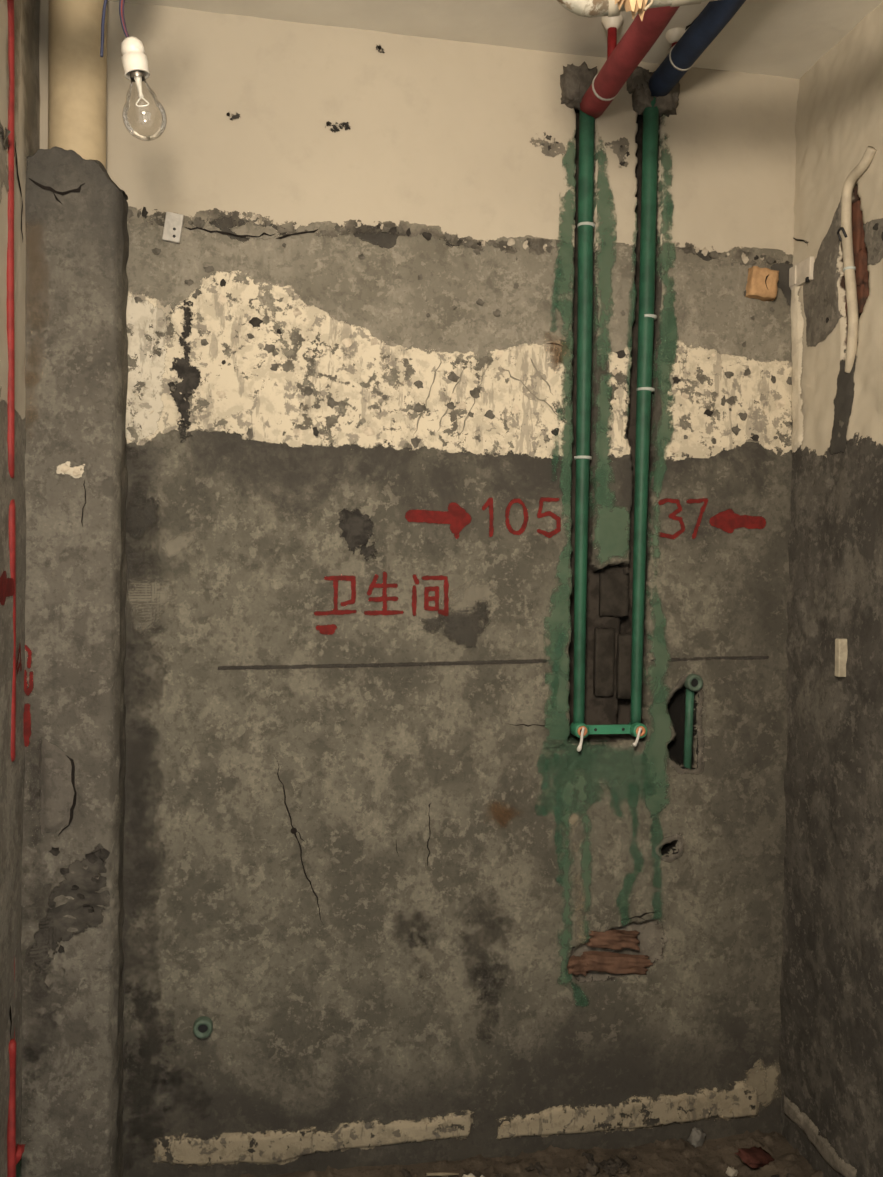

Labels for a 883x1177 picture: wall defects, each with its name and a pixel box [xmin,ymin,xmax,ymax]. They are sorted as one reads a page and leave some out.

peeling [0,122,11,202]
crack [15,142,85,240]
peeling [125,206,574,459]
spalling [593,242,635,458]
peeling [656,200,883,461]
spalling [28,844,110,987]
crack [275,757,322,922]